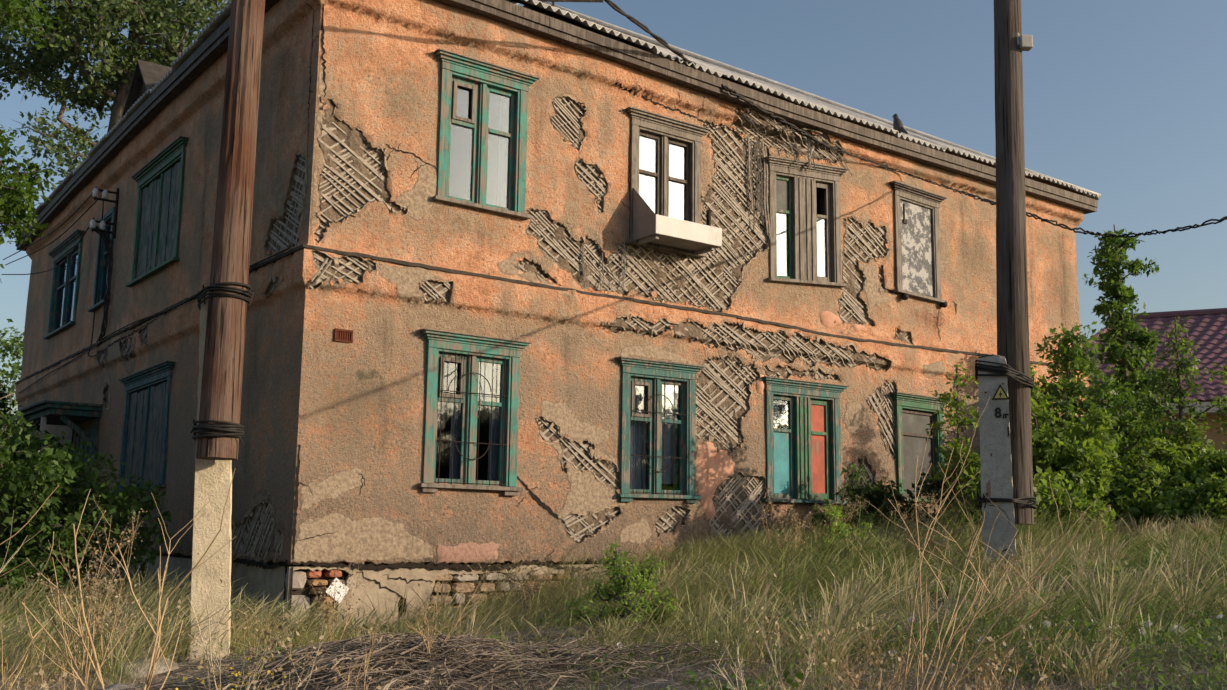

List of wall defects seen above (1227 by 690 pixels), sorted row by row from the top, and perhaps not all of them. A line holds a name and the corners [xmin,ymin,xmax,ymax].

crack [304,1,327,157]
spalling [262,53,453,305]
spalling [498,93,899,545]
peeling [231,468,433,567]
crack [231,445,607,597]